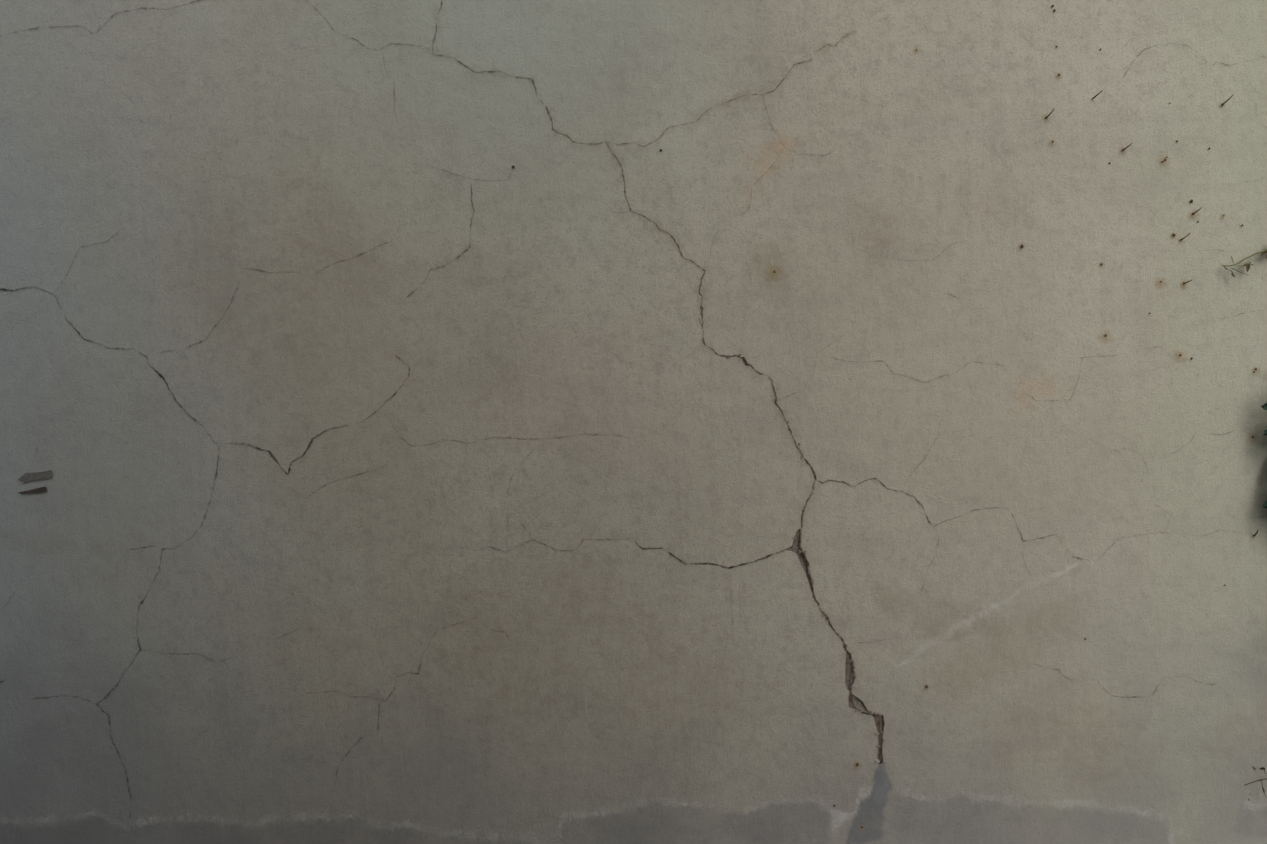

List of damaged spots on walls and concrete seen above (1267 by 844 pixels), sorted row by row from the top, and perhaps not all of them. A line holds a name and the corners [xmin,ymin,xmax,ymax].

crack [256,427,339,475]
crack [613,127,888,764]
damp [848,766,891,844]